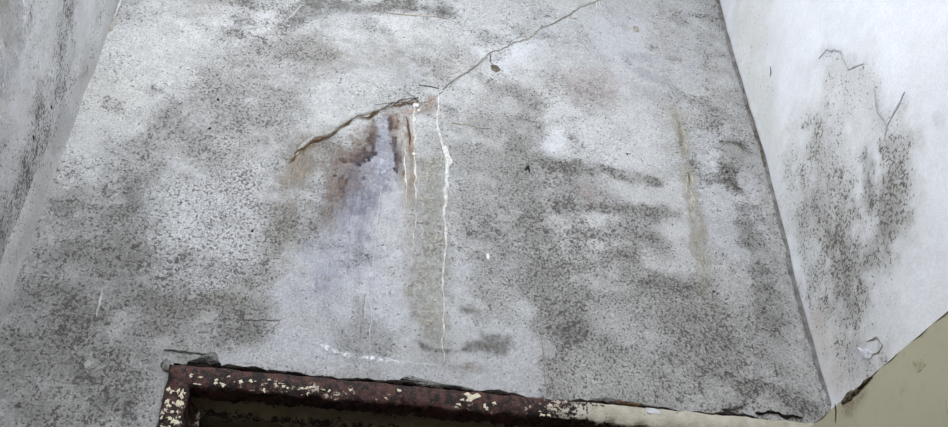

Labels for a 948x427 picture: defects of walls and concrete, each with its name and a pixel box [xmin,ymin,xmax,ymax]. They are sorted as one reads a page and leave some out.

crack [443,0,598,89]
rust [393,102,432,183]
water stain [316,94,453,371]
water stain [478,335,508,353]